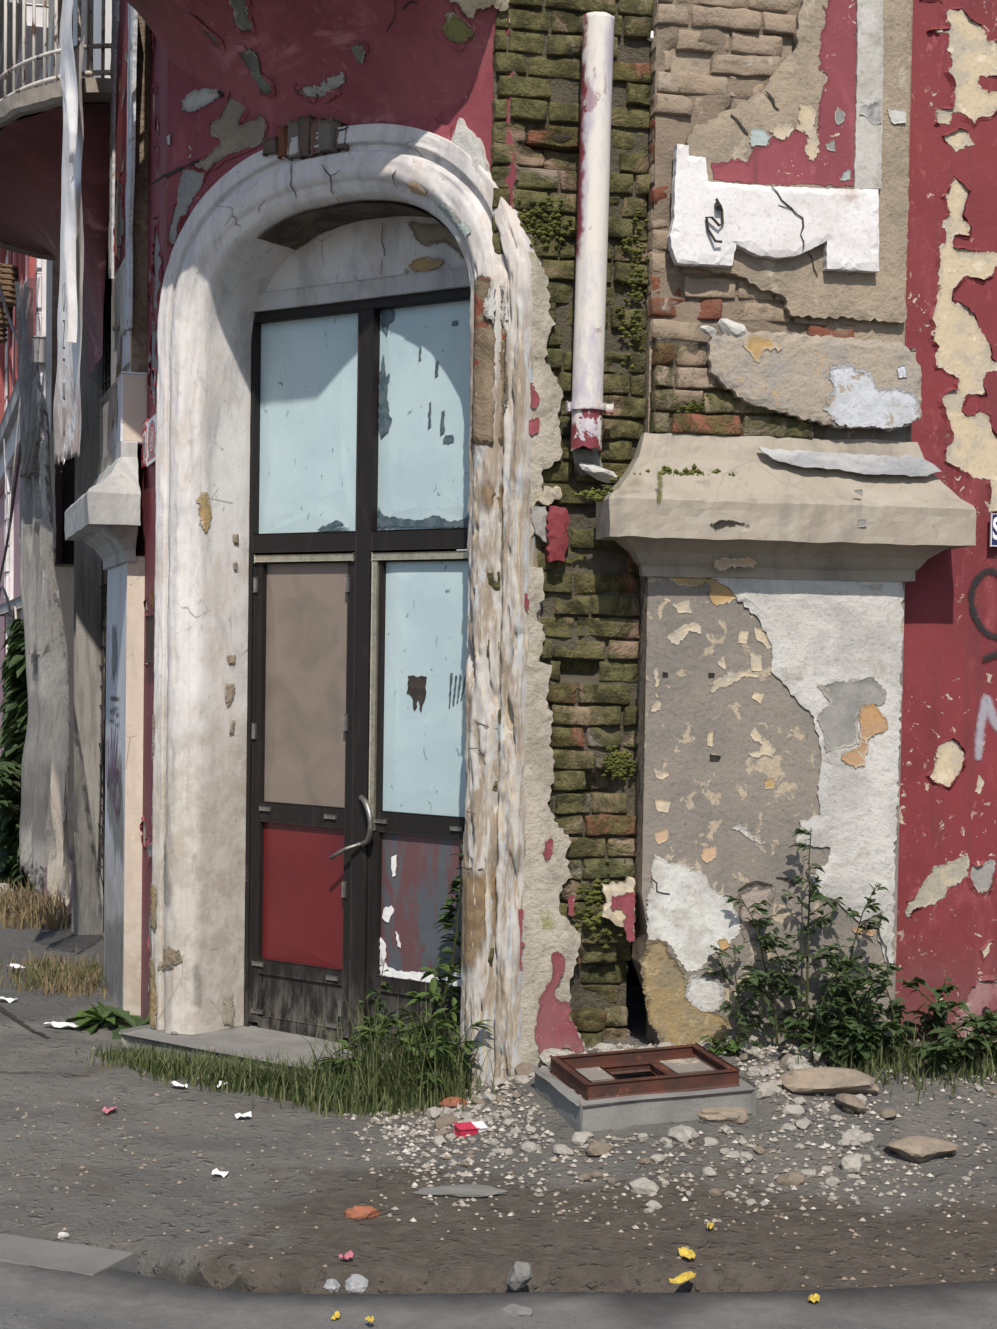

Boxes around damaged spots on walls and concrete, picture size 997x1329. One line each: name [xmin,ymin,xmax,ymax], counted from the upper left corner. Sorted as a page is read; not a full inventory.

peeling [921,0,997,152]
peeling [749,100,907,162]
peeling [147,71,351,403]
crack [771,186,818,277]
peeling [928,174,997,513]
peeling [378,356,392,438]
peeling [823,363,920,429]
peeling [817,677,888,768]
peeling [926,736,984,794]
peeling [639,799,776,1045]
peeling [905,855,997,918]
peeling [950,939,997,1037]